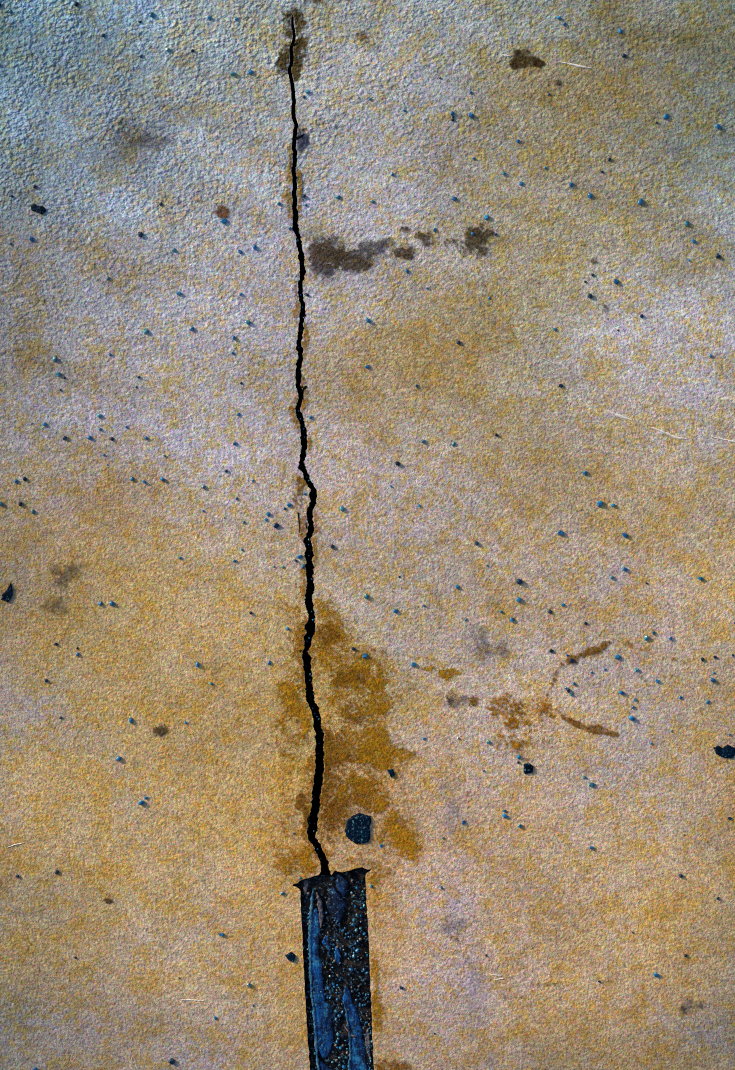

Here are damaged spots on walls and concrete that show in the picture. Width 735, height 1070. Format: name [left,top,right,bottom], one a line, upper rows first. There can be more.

crack [288,15,331,875]
damp [312,223,494,280]